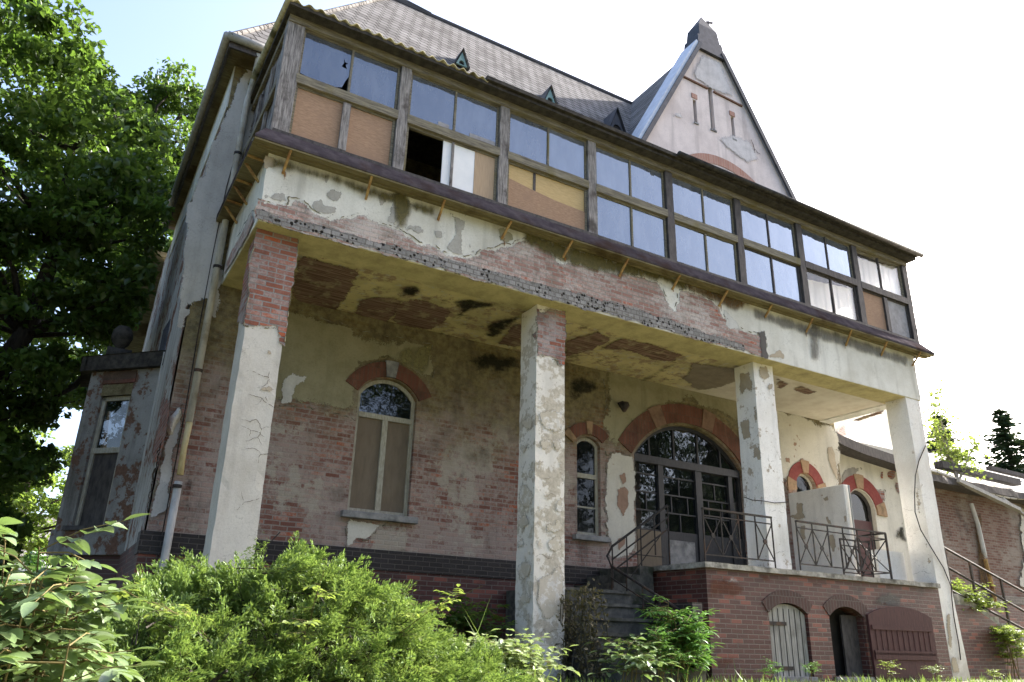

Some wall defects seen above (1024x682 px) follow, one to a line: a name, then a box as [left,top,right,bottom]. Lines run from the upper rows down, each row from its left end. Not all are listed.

damp [488,317,518,337]
crack [247,370,281,463]
damp [473,354,519,371]
flaking render [237,177,816,560]
damp [572,379,597,397]
peeling [517,562,564,621]